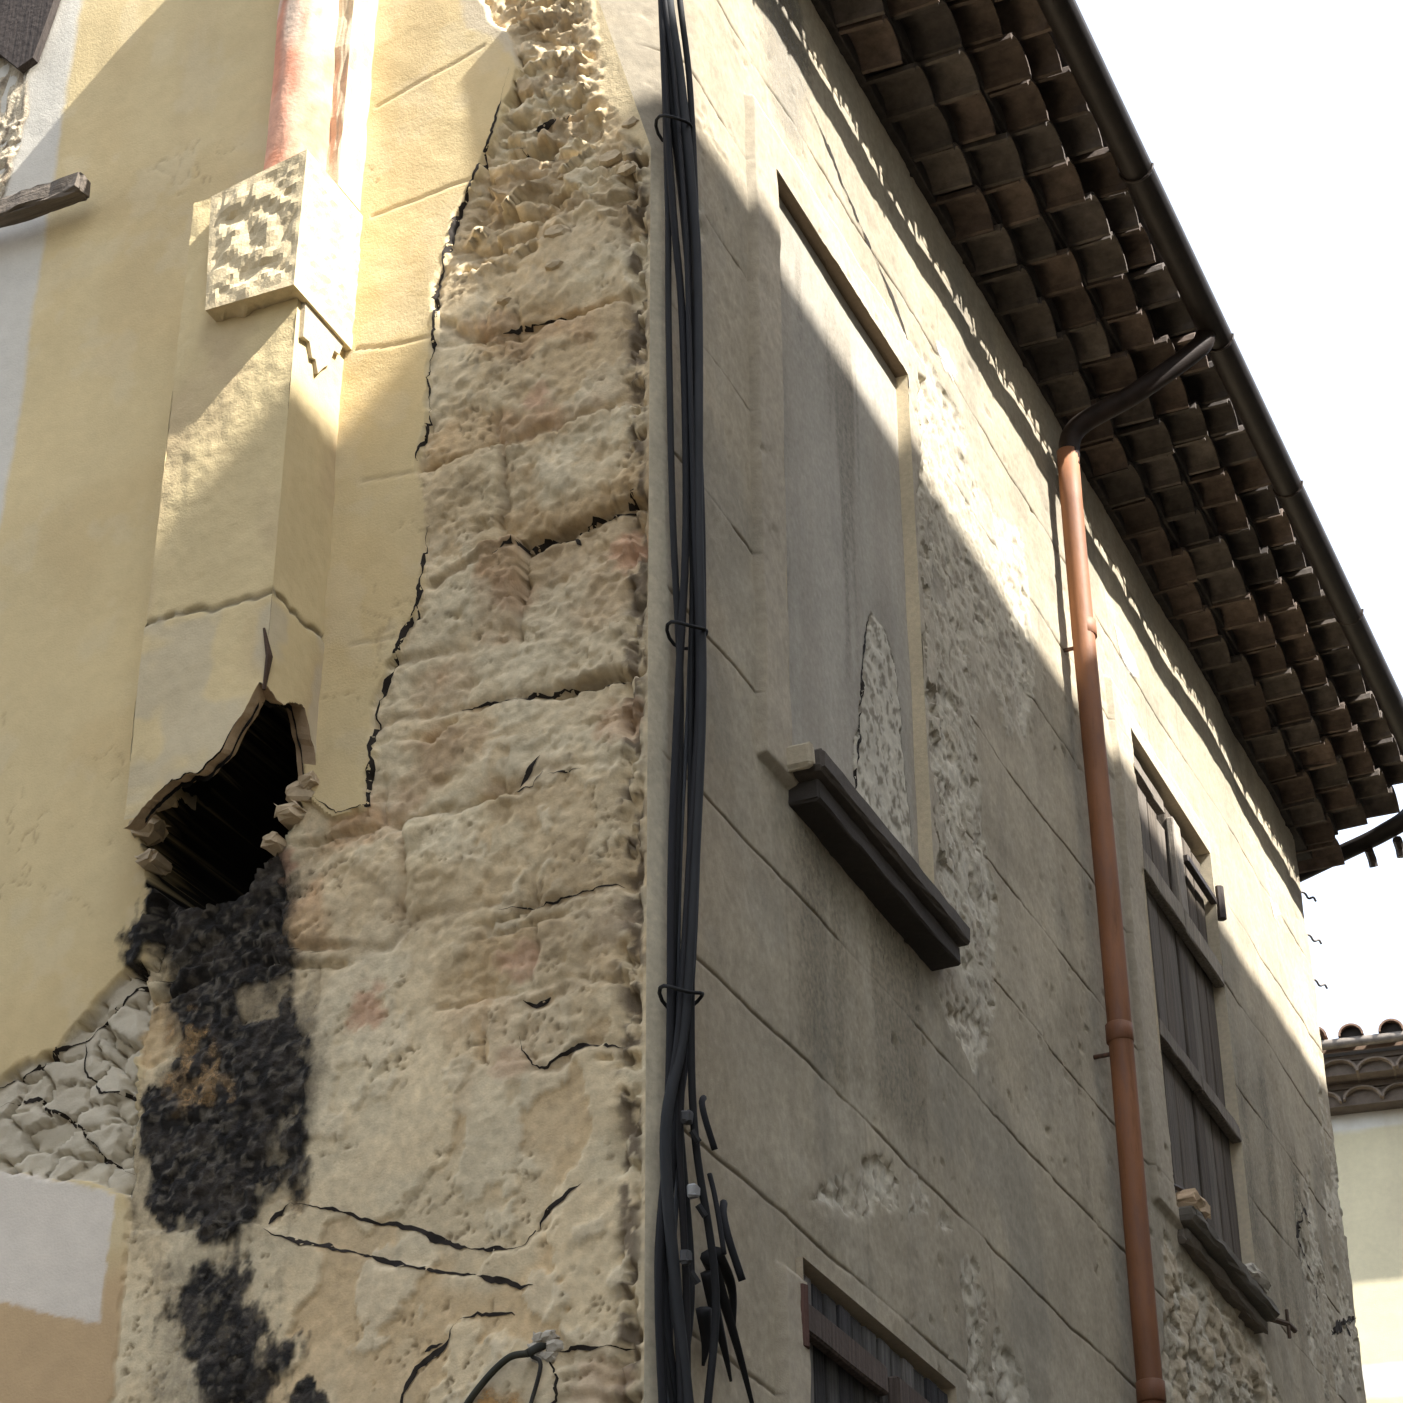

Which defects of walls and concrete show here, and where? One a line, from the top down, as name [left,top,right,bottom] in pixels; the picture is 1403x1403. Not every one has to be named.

crack [415,69,580,459]
crack [313,526,429,813]
spalling [111,0,651,1403]
spalling [853,614,914,858]
spalling [916,342,1036,1073]
crack [0,967,161,1175]
damp [165,1241,303,1403]
crack [265,1184,580,1403]
crack [549,1345,634,1403]
spalling [816,1154,954,1231]
spalling [960,1254,1031,1403]
spalling [1161,1229,1283,1403]